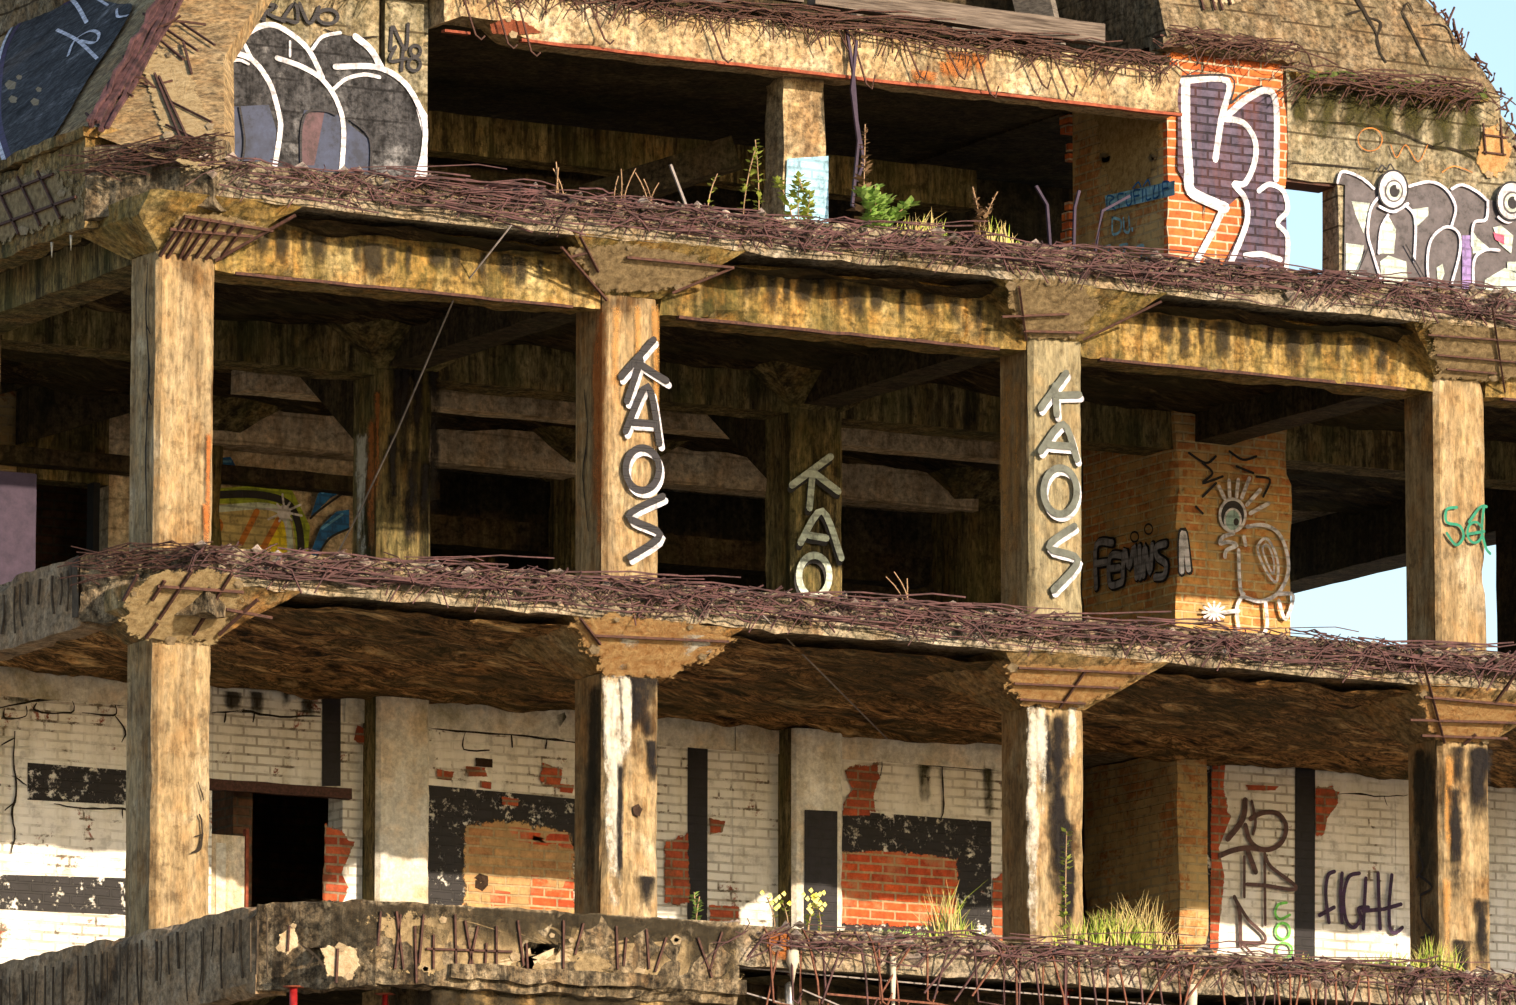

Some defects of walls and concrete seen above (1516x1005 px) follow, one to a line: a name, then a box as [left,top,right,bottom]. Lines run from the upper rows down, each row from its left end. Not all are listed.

leakage [256,230,461,274]
leakage [480,253,544,285]
leakage [1143,313,1388,369]
leakage [687,635,710,652]
leakage [225,692,263,714]
leakage [283,692,314,715]
leakage [326,665,743,1005]
leakage [1027,707,1076,932]
leakage [1413,746,1492,933]
spalling [320,758,1516,1005]
leakage [1454,898,1490,972]